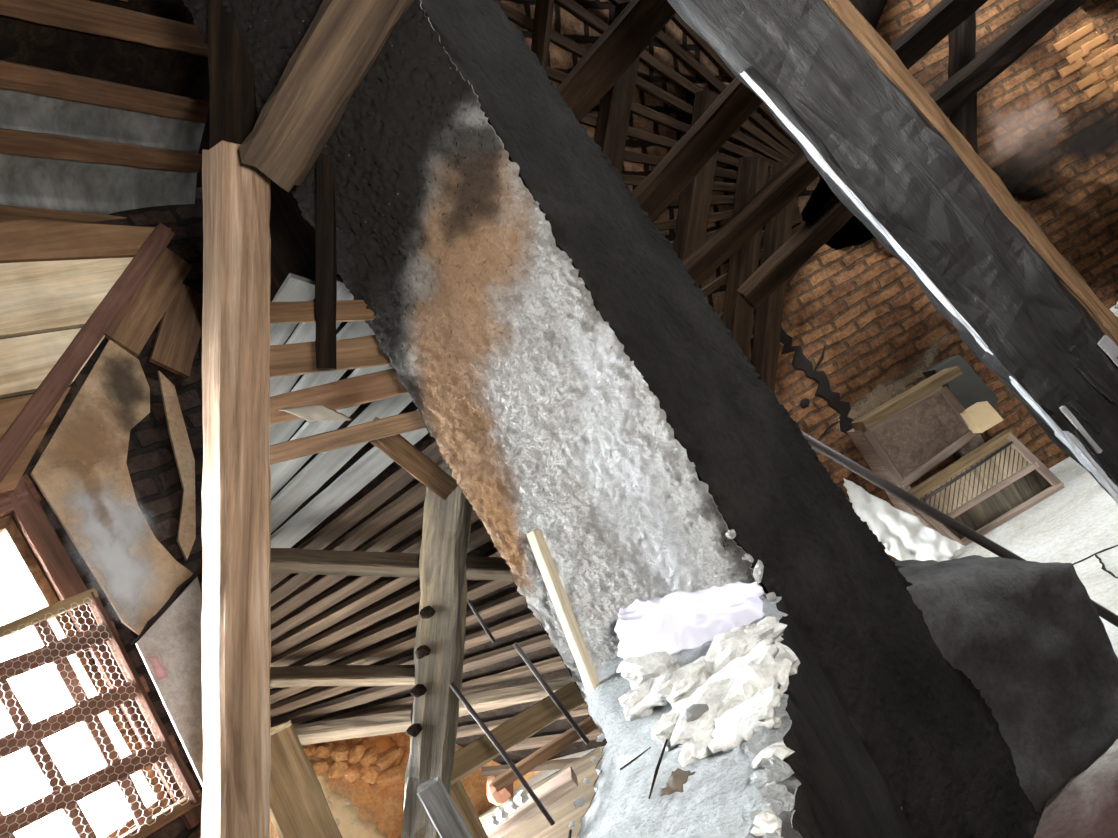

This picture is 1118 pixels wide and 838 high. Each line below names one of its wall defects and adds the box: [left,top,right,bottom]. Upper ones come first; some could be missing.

leakage [449,127,499,230]
crack [780,326,854,437]
flaking render [627,638,779,721]
spalling [707,680,803,838]